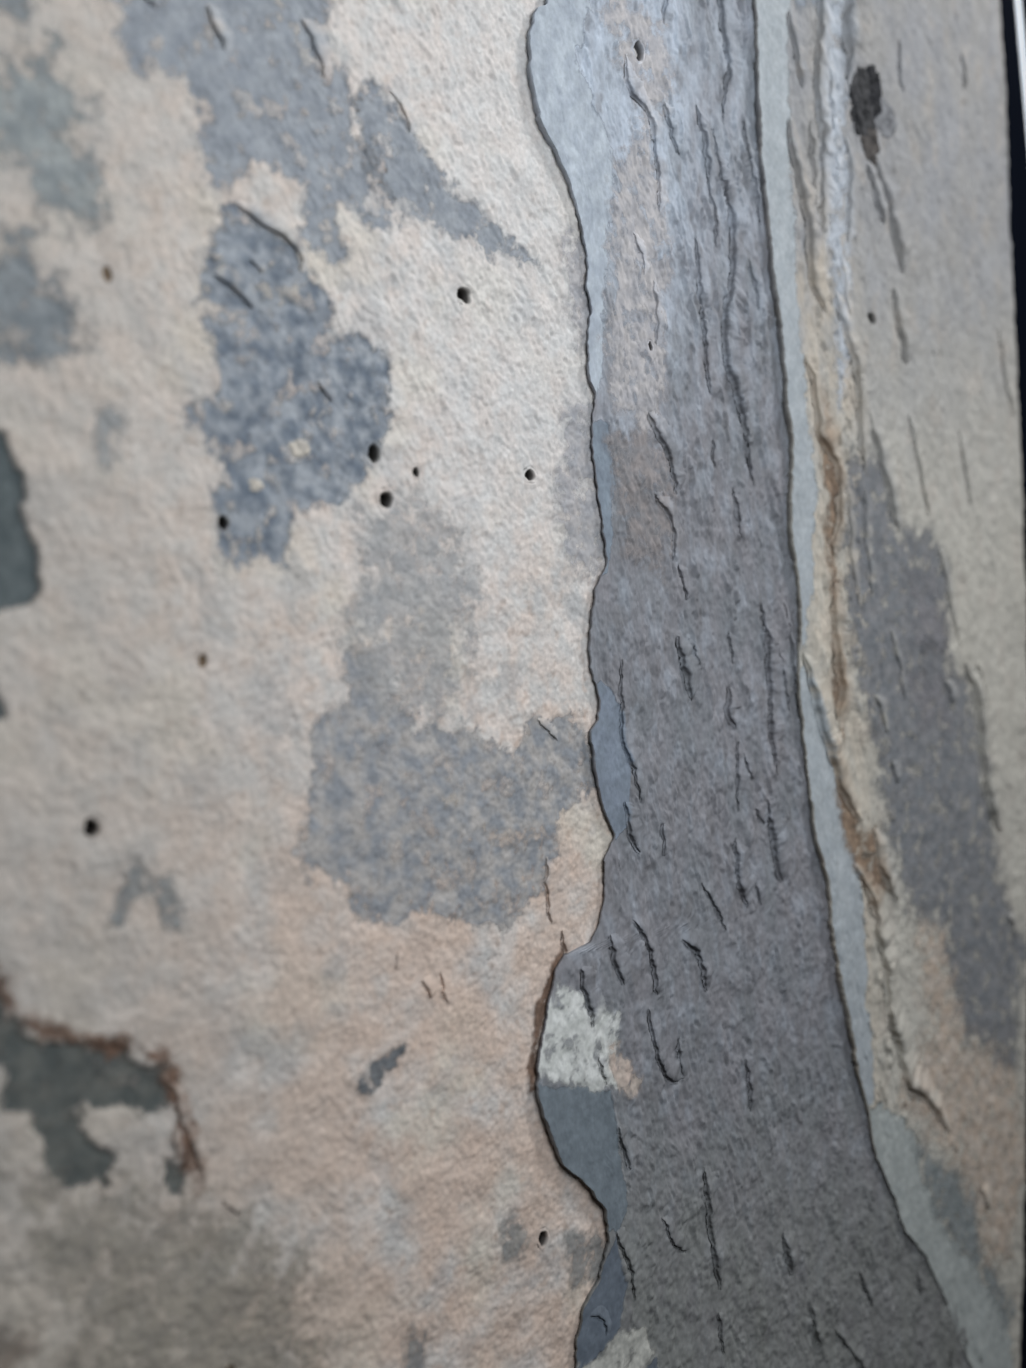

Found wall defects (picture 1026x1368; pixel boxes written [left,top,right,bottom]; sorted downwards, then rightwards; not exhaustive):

crack [998,329,1016,416]
spalling [0,432,40,610]
crack [543,0,1003,1134]
peeling [526,0,1026,1368]
crack [538,715,559,741]
spalling [0,998,171,1189]
spalling [163,1159,184,1195]
crack [617,1124,639,1170]
crack [981,1182,992,1212]